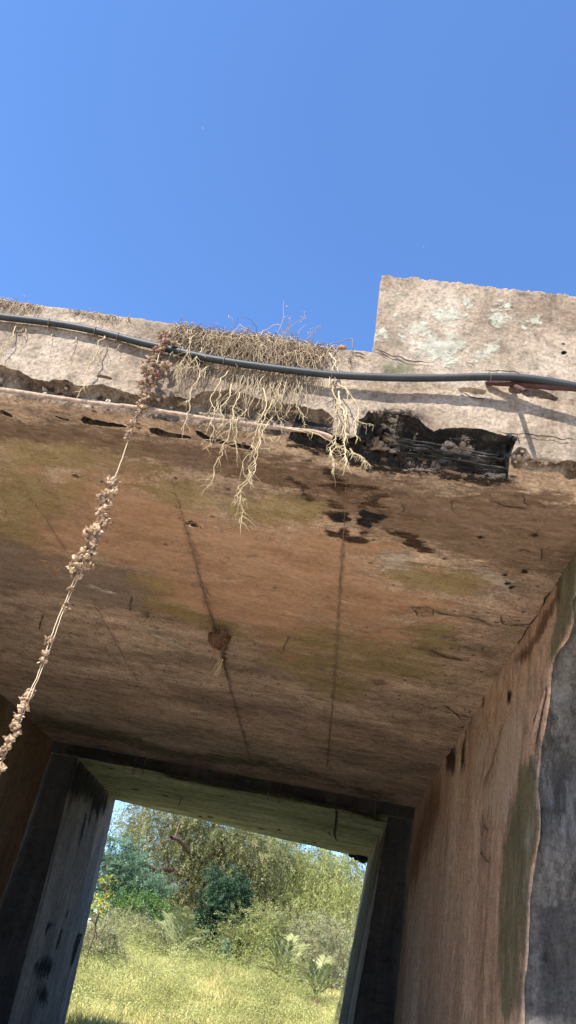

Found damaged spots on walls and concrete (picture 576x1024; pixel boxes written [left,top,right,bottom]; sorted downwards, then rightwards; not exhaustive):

crack [170,474,251,762]
spalling [0,365,576,480]
water stain [0,415,576,605]
crack [326,472,380,773]